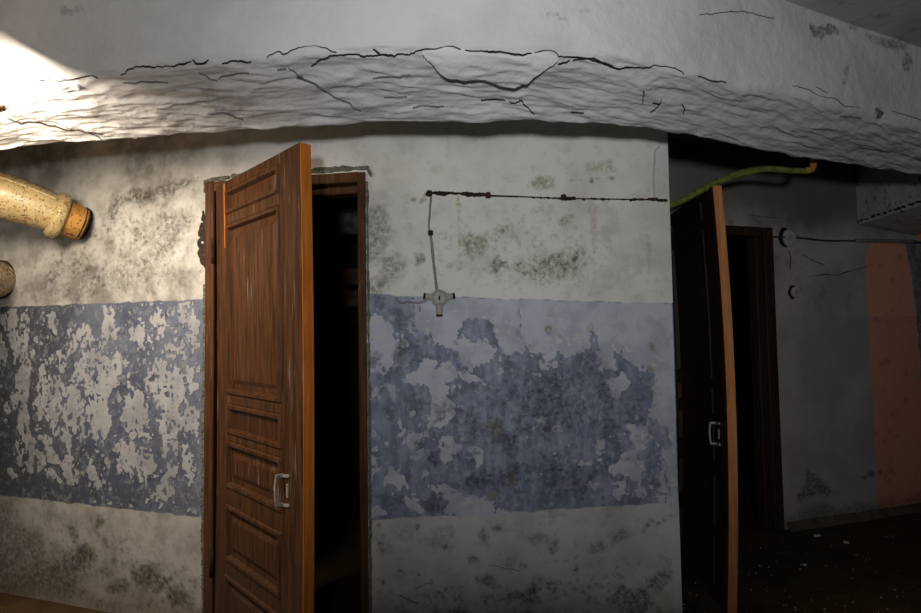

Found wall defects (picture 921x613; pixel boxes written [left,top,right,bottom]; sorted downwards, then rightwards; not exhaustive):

crack [5,75,106,141]
crack [121,45,727,120]
crack [792,85,862,119]
spalling [311,165,372,177]
leakage [108,181,190,230]
peeling [367,296,678,521]
peeling [0,284,205,613]